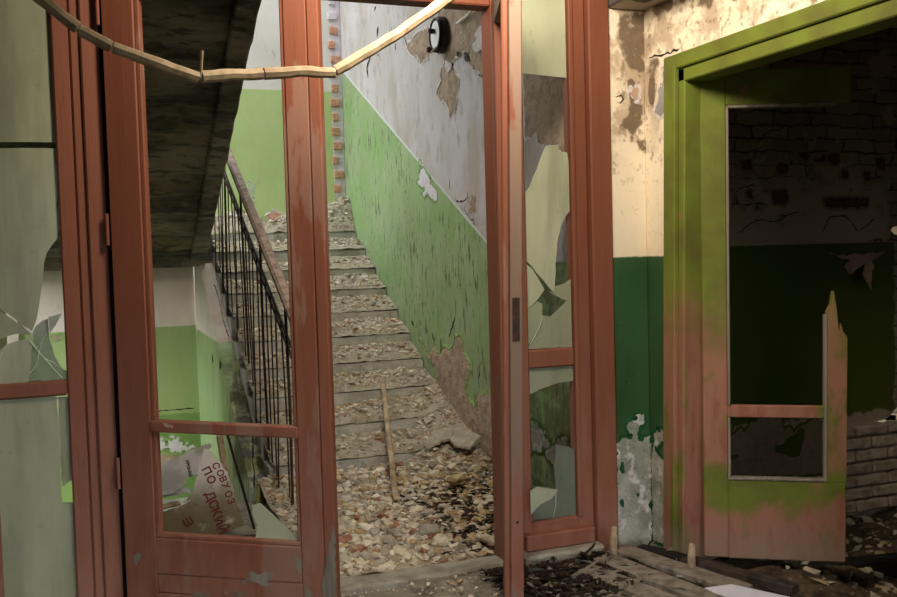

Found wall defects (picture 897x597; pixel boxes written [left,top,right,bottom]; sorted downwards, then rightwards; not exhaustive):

spalling [395,9,483,121]
spalling [522,73,565,152]
water stain [618,0,685,153]
peeling [418,333,492,460]
peeling [617,410,663,548]